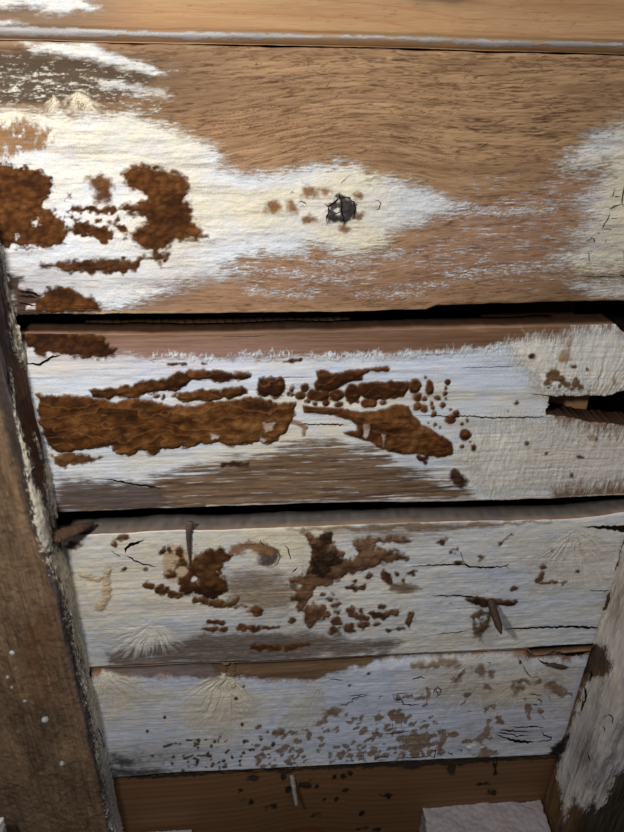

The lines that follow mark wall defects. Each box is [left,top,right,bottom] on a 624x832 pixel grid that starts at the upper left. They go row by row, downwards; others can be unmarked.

leakage [0,41,173,104]
leakage [473,204,557,216]
leakage [496,122,624,275]
leakage [266,267,351,283]
leakage [417,236,492,280]
leakage [571,279,624,299]
leakage [581,471,624,493]
crack [418,552,509,569]
crack [586,525,624,570]
crack [432,592,485,600]
crack [505,590,610,630]
peeling [254,687,504,769]